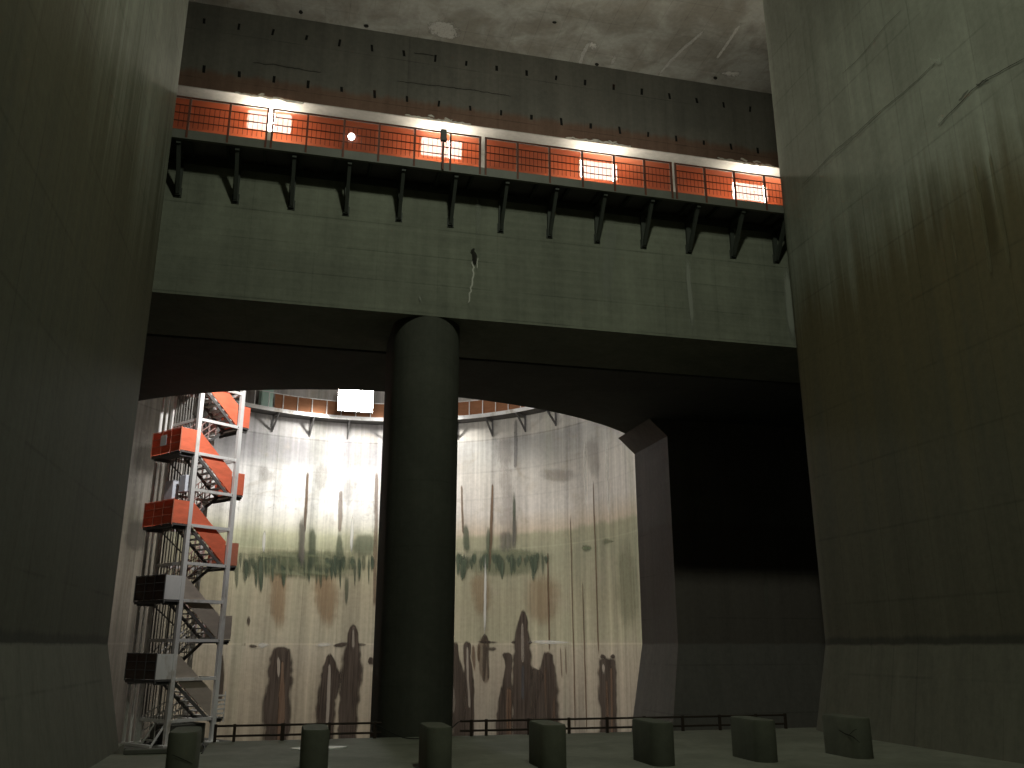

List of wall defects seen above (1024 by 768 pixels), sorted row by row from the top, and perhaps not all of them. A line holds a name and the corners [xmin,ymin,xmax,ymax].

crack [938,58,1024,123]
crack [469,248,477,301]
corrosion [472,634,496,679]